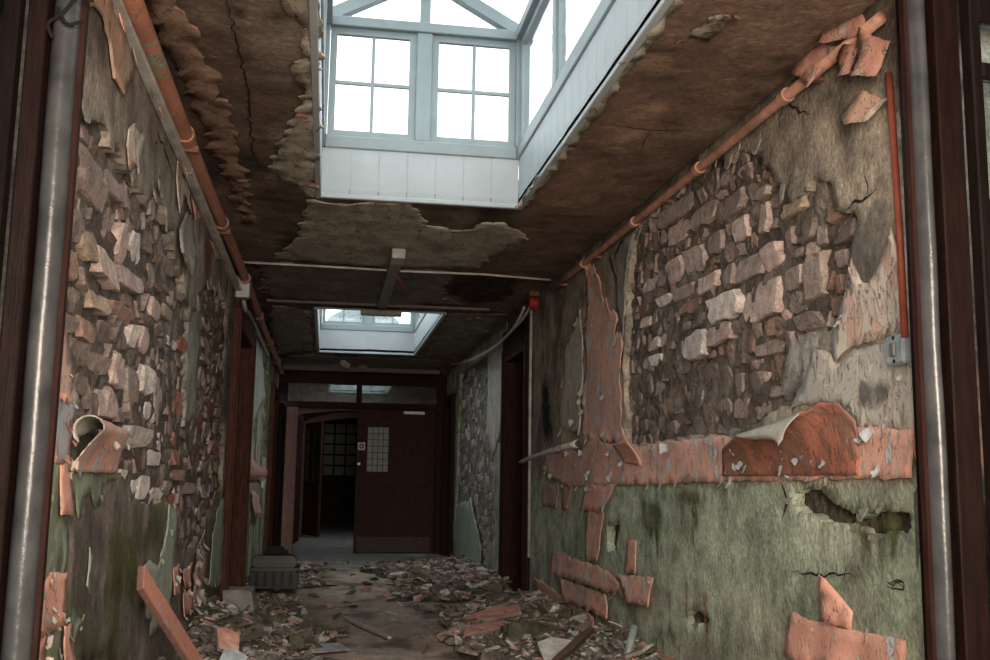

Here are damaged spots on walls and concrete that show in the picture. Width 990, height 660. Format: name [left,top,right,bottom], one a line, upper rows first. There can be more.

peeling [90,0,138,94]
peeling [144,0,256,224]
peeling [249,0,529,305]
peeling [789,14,890,87]
peeling [839,90,887,125]
water stain [448,277,521,303]
flaking render [39,99,230,660]
peeling [250,341,268,518]
flaking render [455,340,503,564]
flaking render [534,133,914,629]
water stain [72,520,103,637]
peeling [783,574,907,660]